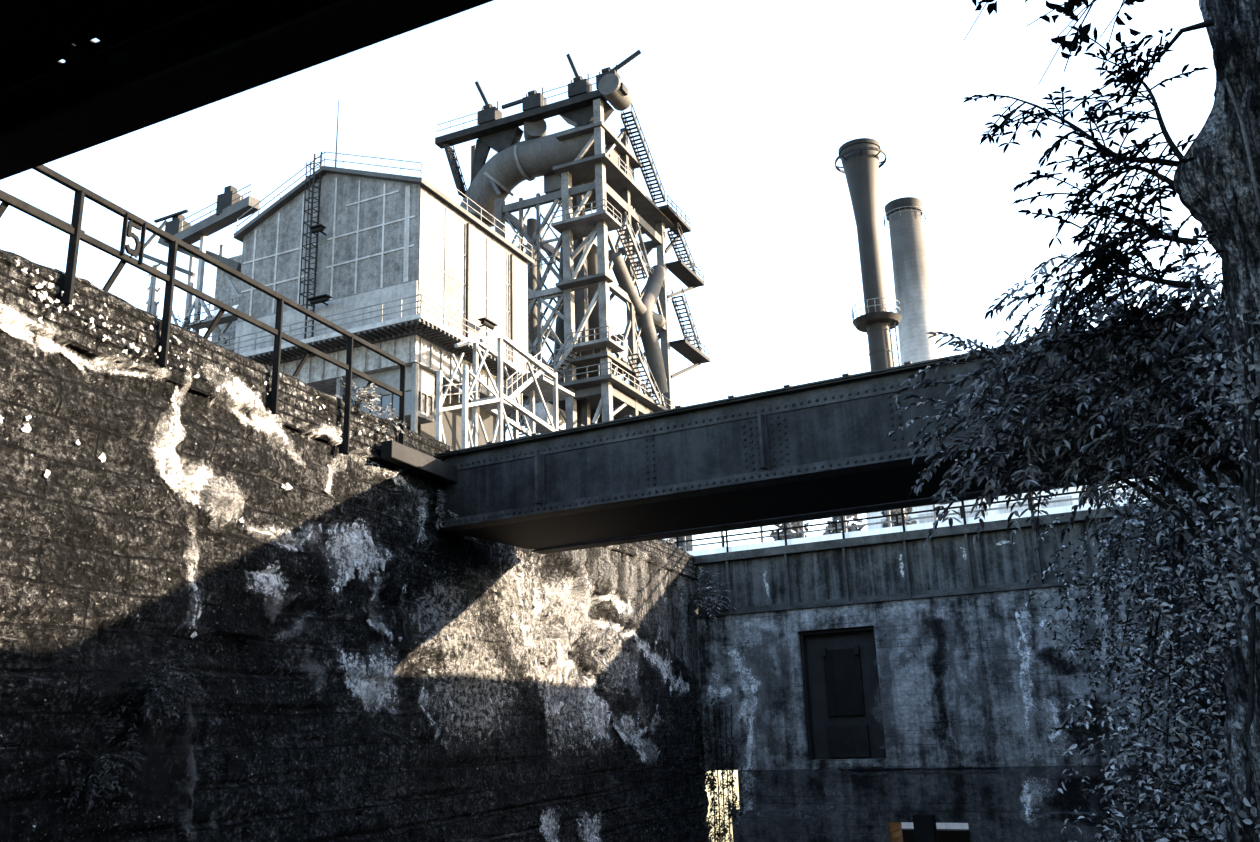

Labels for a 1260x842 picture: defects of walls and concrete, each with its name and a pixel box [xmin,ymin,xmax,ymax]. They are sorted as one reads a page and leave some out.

leakage [0,304,427,627]
leakage [874,607,1133,833]